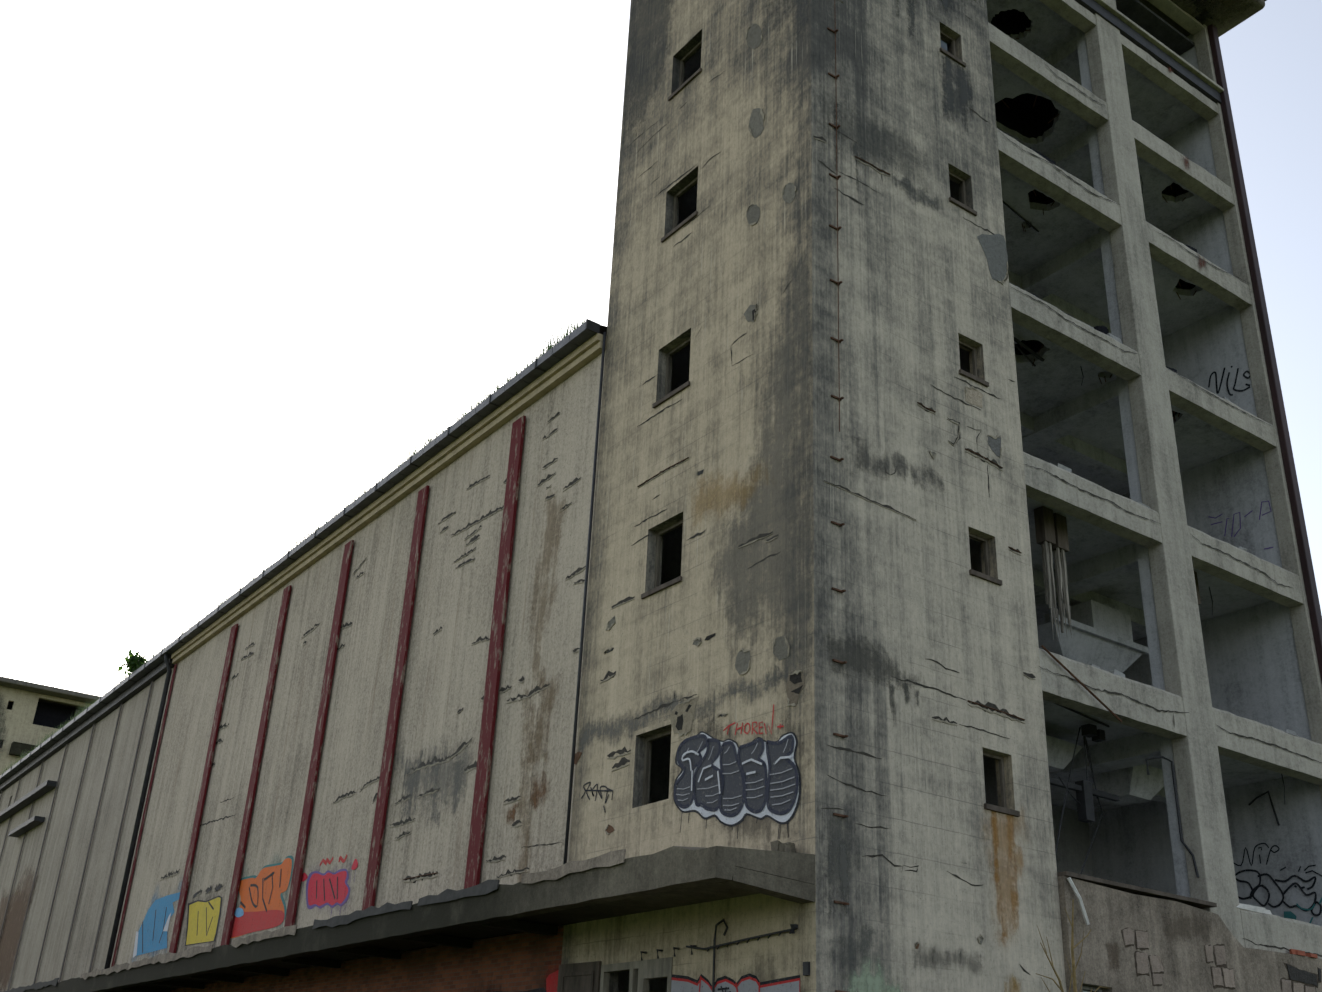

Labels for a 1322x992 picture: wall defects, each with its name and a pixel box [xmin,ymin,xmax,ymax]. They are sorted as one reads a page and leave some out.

water stain [627,0,670,130]
spalling [977,234,1008,285]
water stain [828,636,919,716]
crack [891,659,1010,739]
spalling [406,737,477,776]
spalling [333,776,380,804]
spalling [389,787,440,841]